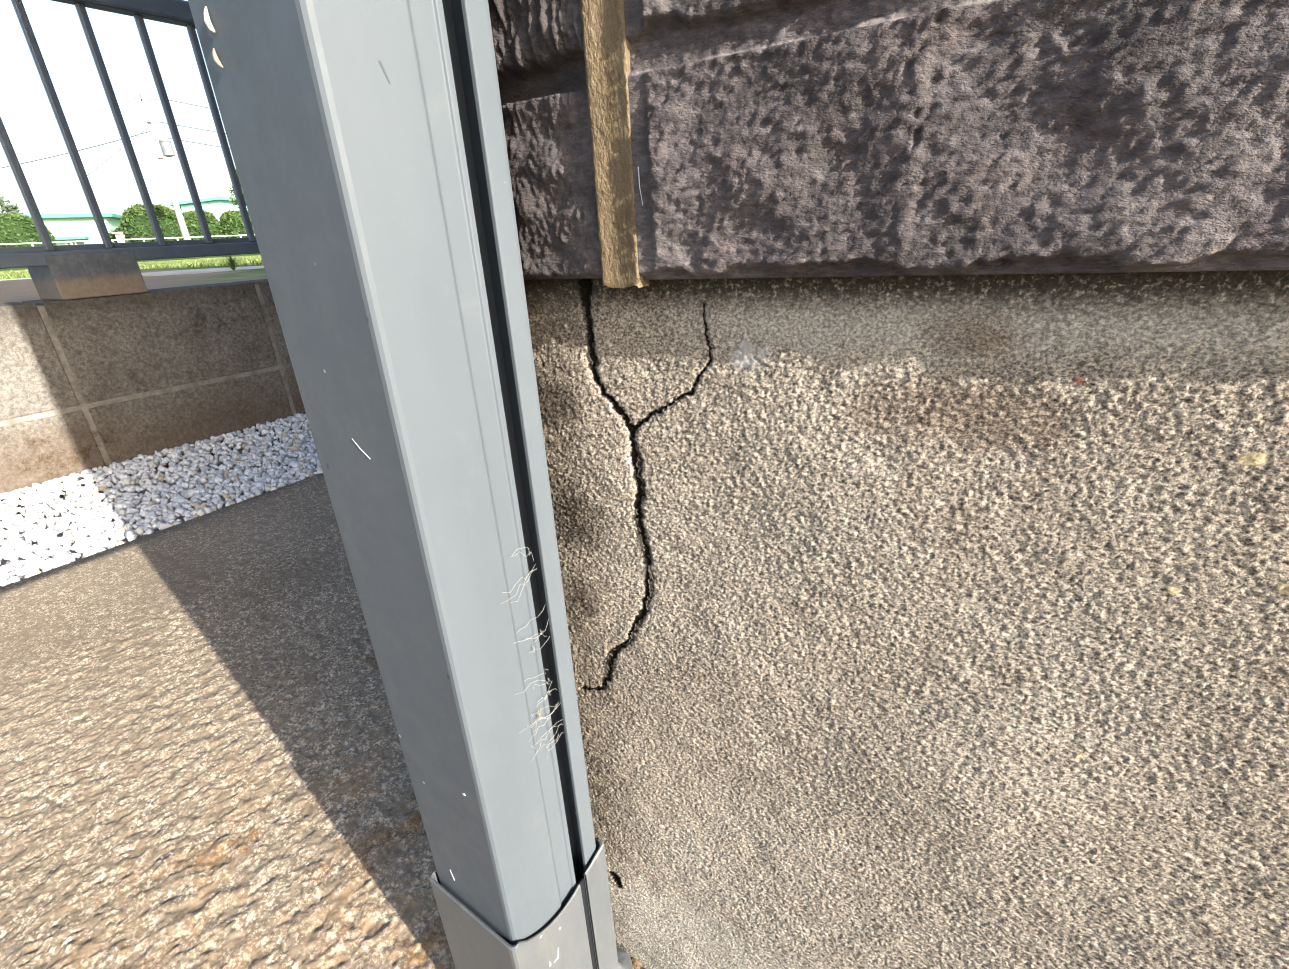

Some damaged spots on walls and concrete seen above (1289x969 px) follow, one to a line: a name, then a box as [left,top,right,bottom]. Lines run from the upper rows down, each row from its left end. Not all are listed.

crack [578,278,712,690]